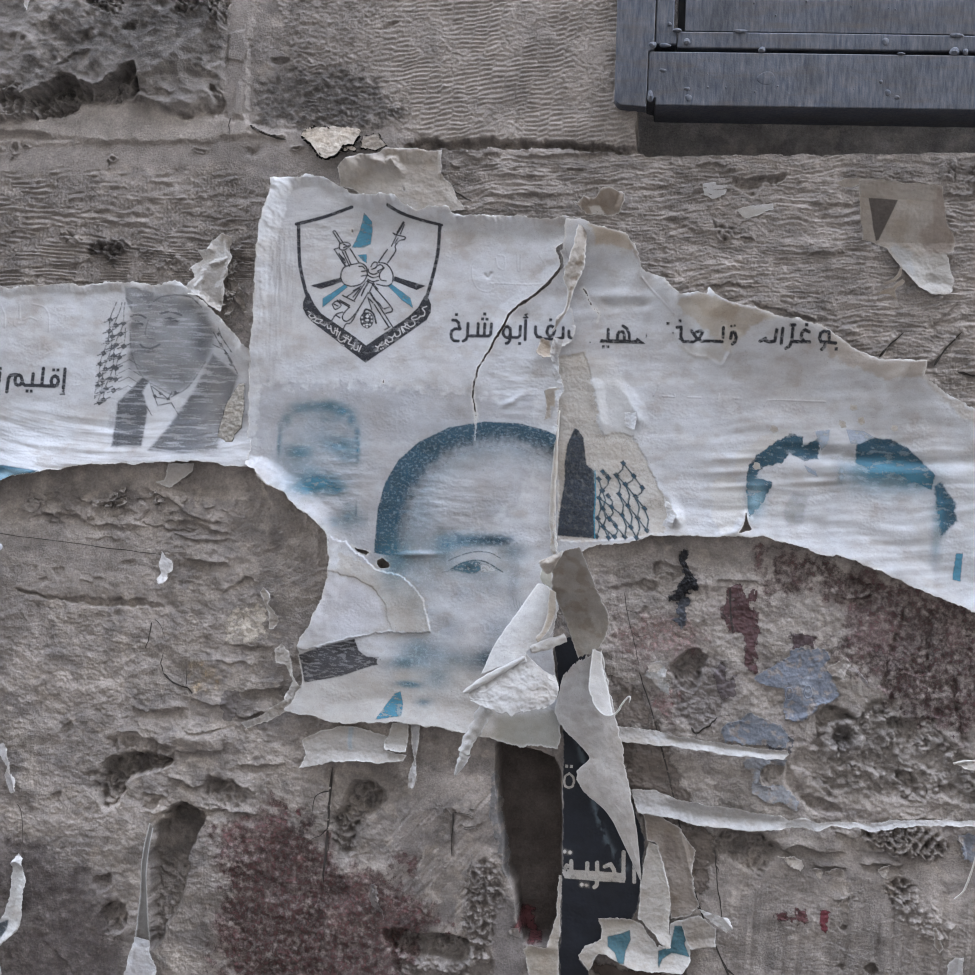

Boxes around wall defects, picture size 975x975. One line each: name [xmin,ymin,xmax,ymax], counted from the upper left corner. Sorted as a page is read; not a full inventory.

spalling [731,173,788,198]
spalling [86,236,189,273]
flaking render [222,246,247,319]
spalling [644,648,709,695]
spalling [721,647,975,811]
spalling [93,751,174,813]
spalling [329,779,388,862]
spalling [93,873,129,936]
spalling [147,801,206,951]
peeling [369,741,563,975]
spalling [712,829,844,883]
spalling [878,865,917,914]